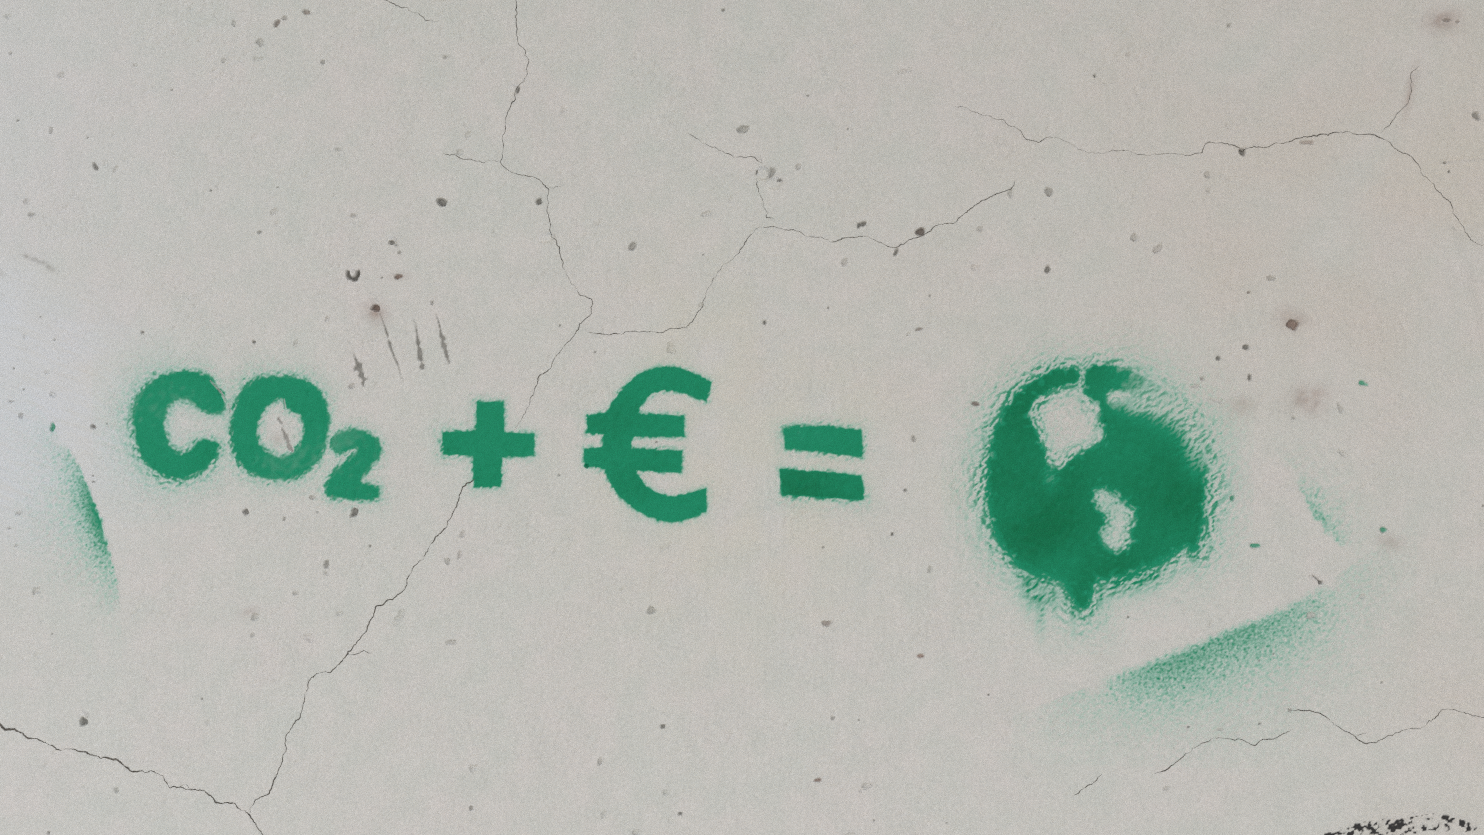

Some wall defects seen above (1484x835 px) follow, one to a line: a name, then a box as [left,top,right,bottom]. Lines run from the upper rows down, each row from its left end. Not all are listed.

crack [443,2,1015,428]
crack [960,68,1483,246]
crack [0,479,475,835]
crack [1158,709,1484,773]